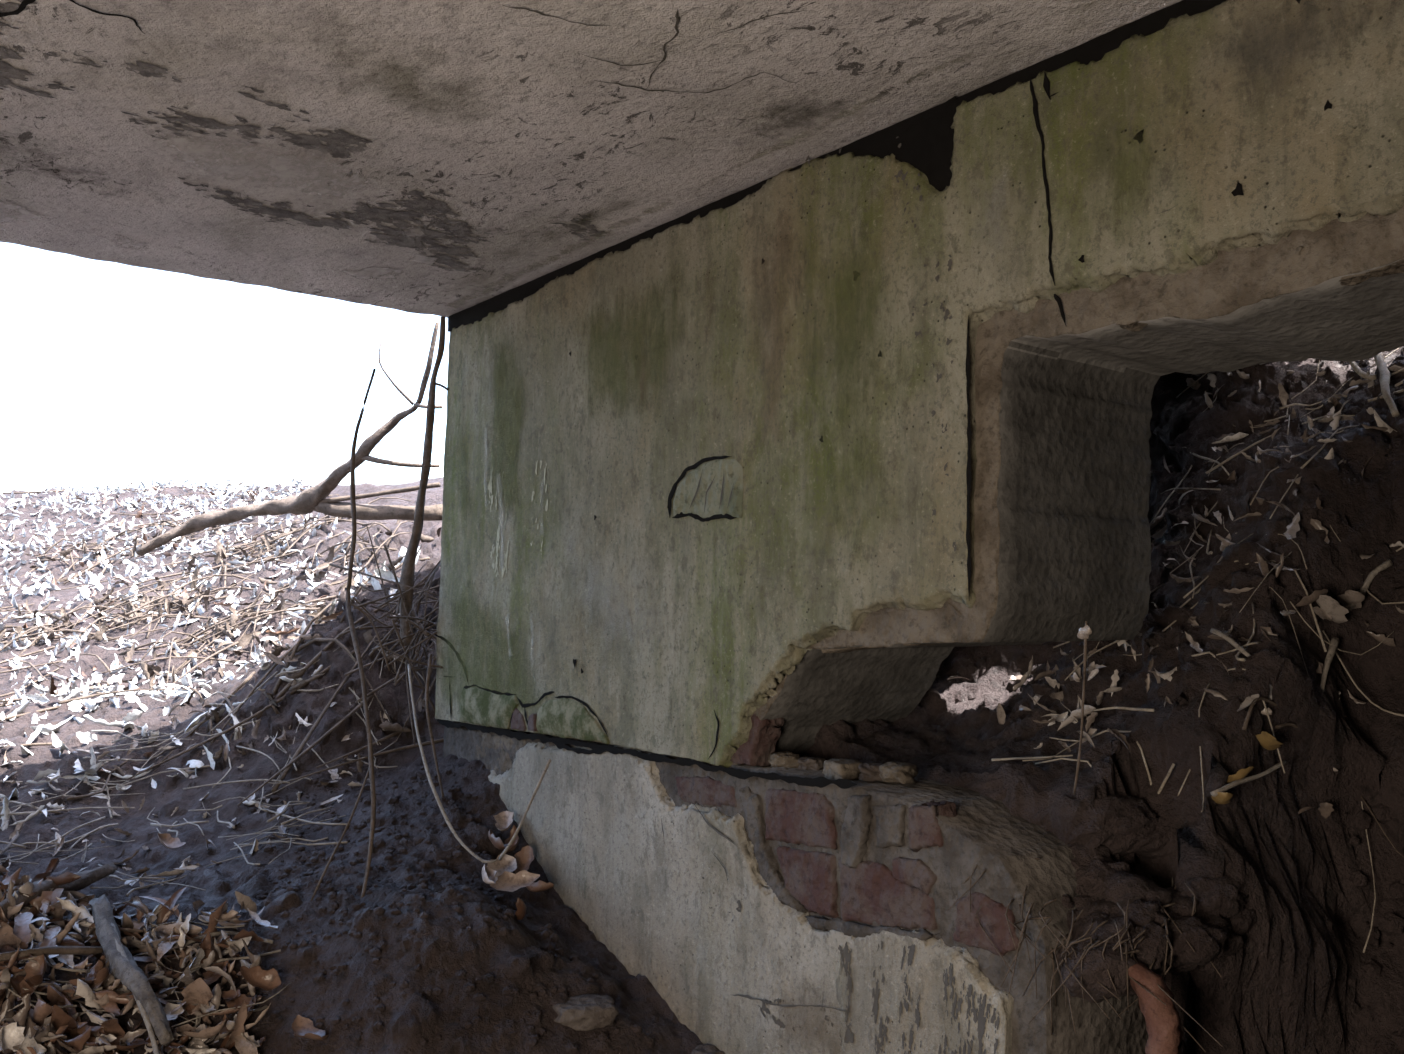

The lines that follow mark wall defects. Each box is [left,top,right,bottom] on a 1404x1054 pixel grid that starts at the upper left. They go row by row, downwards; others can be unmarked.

crack [0,0,36,17]
crack [69,0,145,34]
crack [448,0,1227,332]
spalling [890,96,957,228]
spalling [1231,182,1244,196]
spalling [1339,259,1404,286]
flaking render [730,714,784,767]
spalling [675,776,1019,956]
peeling [758,998,801,1031]